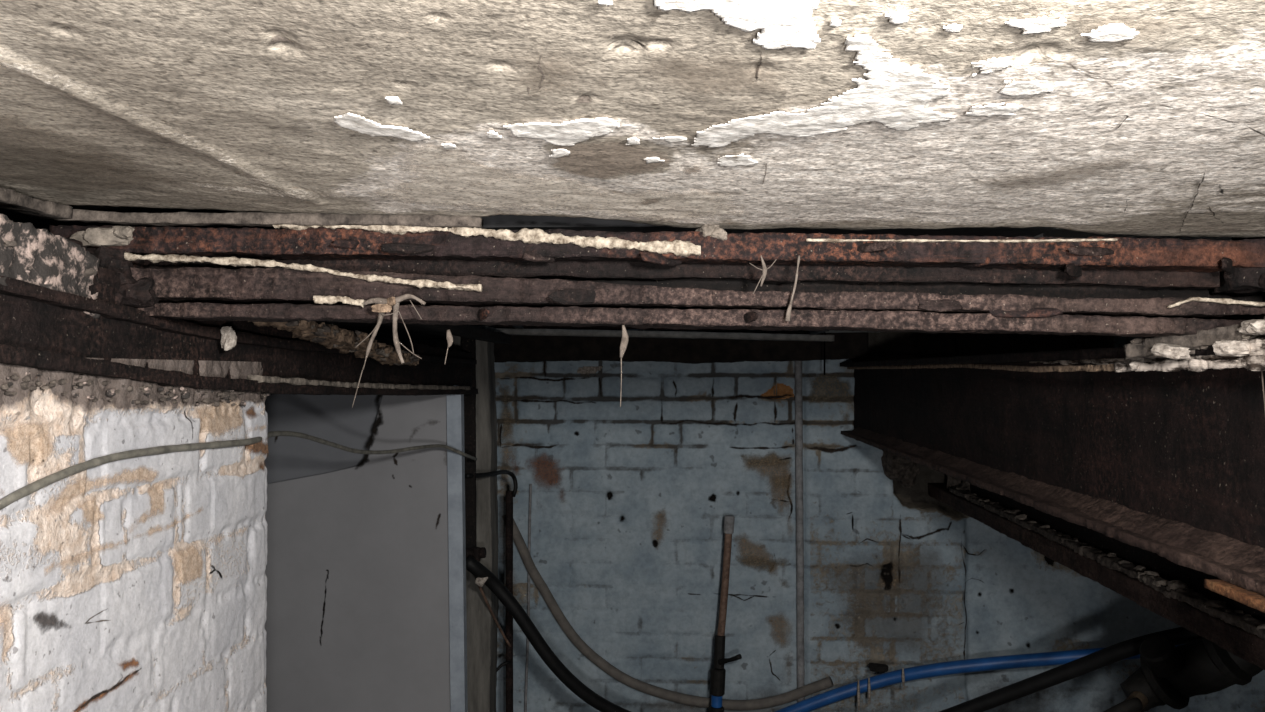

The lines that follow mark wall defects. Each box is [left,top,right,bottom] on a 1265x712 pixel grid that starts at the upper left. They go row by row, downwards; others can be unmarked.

peeling [1080,23,1139,43]
peeling [486,0,1053,179]
peeling [333,112,457,149]
crack [1166,106,1265,136]
water stain [183,135,340,199]
water stain [378,146,745,222]
crack [1180,173,1223,231]
rust [640,252,682,266]
rust [857,241,896,253]
rust [1064,247,1114,277]
rust [136,290,1247,338]
peeling [810,338,1265,402]